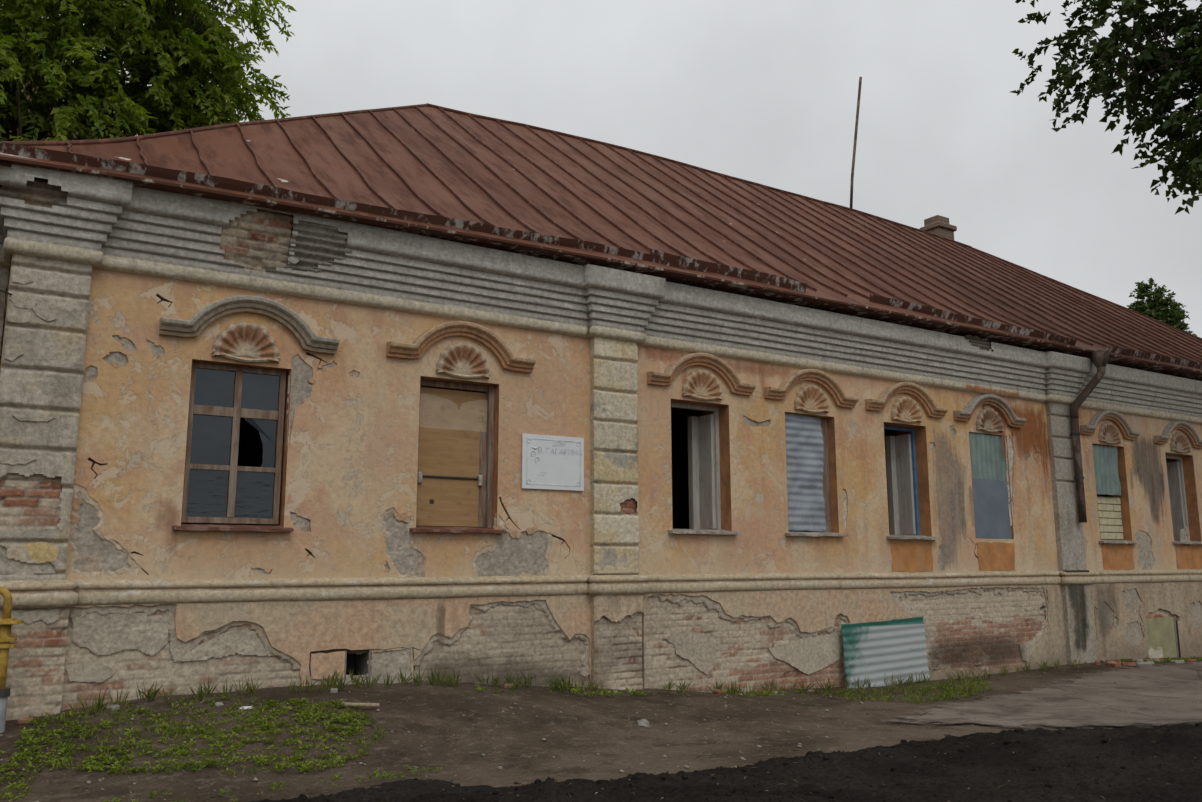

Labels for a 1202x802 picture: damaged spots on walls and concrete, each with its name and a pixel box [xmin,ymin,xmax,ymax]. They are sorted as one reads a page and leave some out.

flaking render [215,209,352,277]
flaking render [0,270,56,361]
flaking render [83,335,165,382]
flaking render [0,452,142,578]
flaking render [380,507,426,577]
flaking render [471,513,552,576]
flaking render [0,594,849,721]
flaking render [890,587,1047,672]